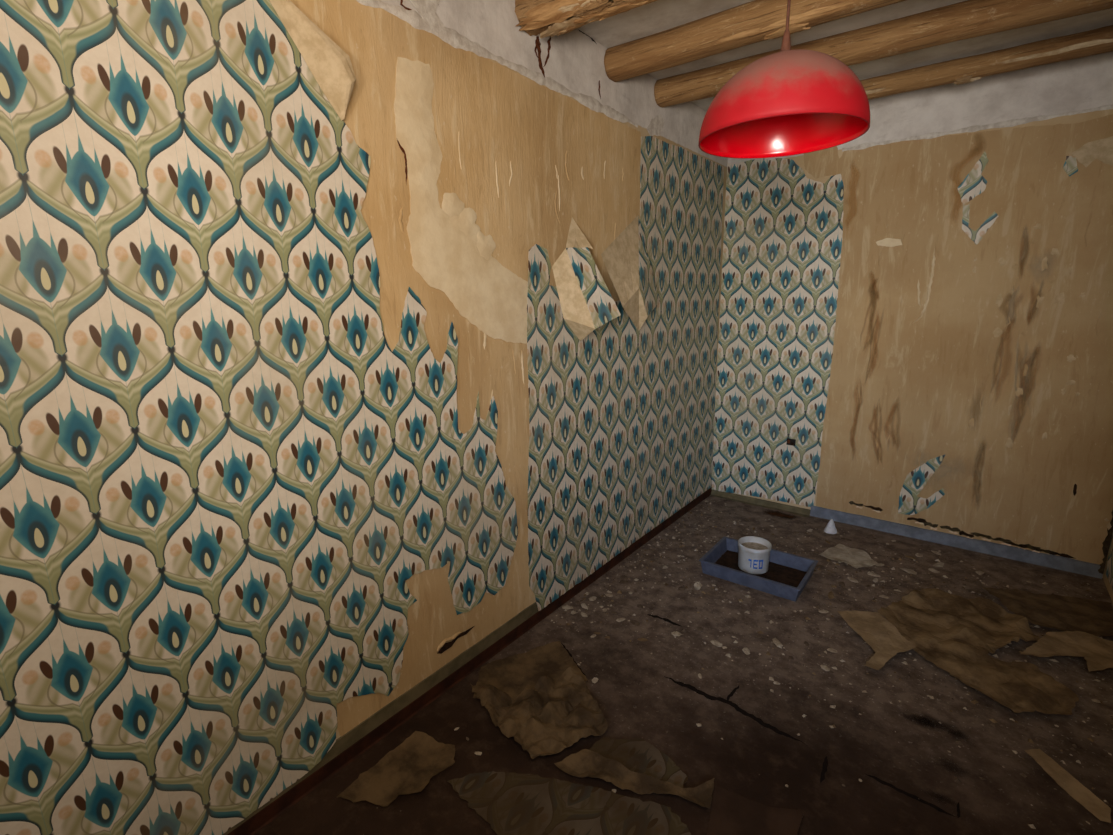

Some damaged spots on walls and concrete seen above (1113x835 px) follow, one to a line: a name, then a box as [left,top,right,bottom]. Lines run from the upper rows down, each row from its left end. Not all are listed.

peeling [290,0,657,736]
peeling [804,114,1113,564]
crack [647,614,681,626]